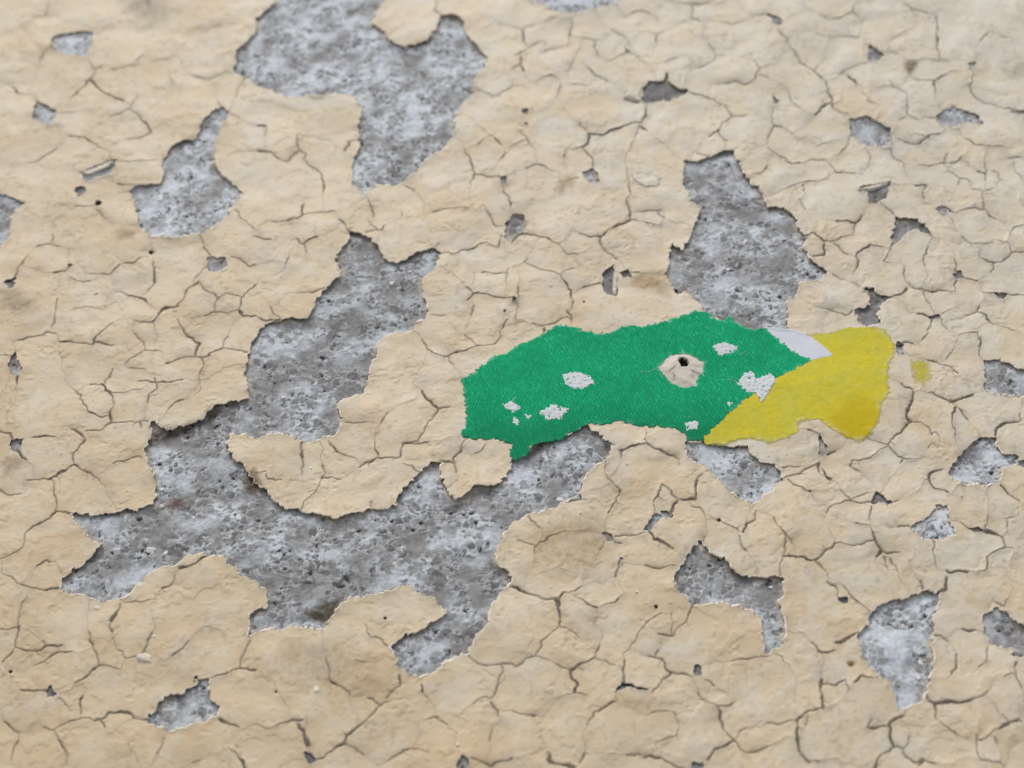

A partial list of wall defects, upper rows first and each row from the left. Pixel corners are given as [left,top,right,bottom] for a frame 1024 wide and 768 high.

crack [30,54,155,189]
peeling [128,106,244,239]
peeling [232,0,489,195]
crack [252,0,1024,611]
peeling [664,149,828,330]
crack [0,80,357,768]
peeling [59,230,612,678]
peeling [683,440,784,504]
peeling [146,674,221,733]
crack [317,428,1024,768]
peeling [672,539,788,654]
peeling [855,589,941,711]